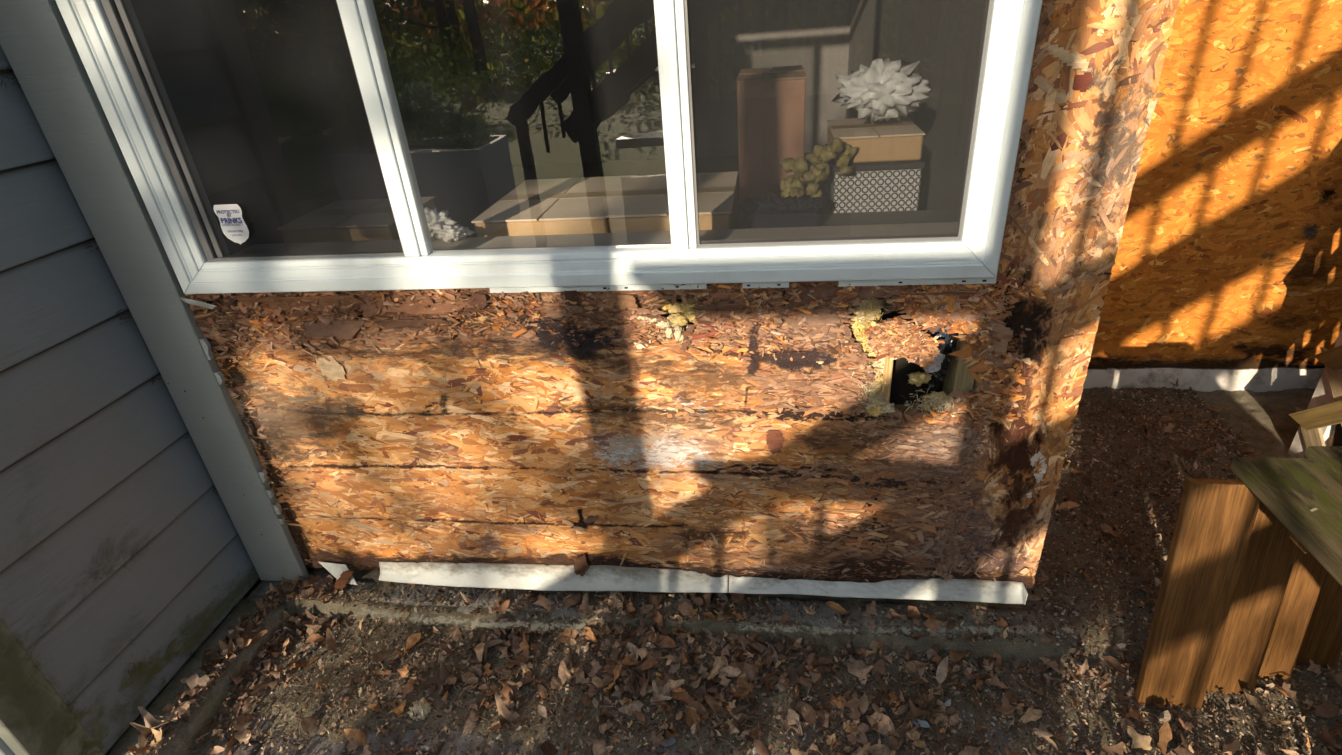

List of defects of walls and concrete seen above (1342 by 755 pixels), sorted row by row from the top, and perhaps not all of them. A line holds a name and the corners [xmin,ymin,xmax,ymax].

water stain [197,296,372,565]
water stain [355,310,978,491]
peeling [658,294,745,352]
spalling [779,285,1013,423]
water stain [998,270,1052,374]
water stain [550,552,670,569]
water stain [673,509,940,583]
water stain [956,479,1029,577]